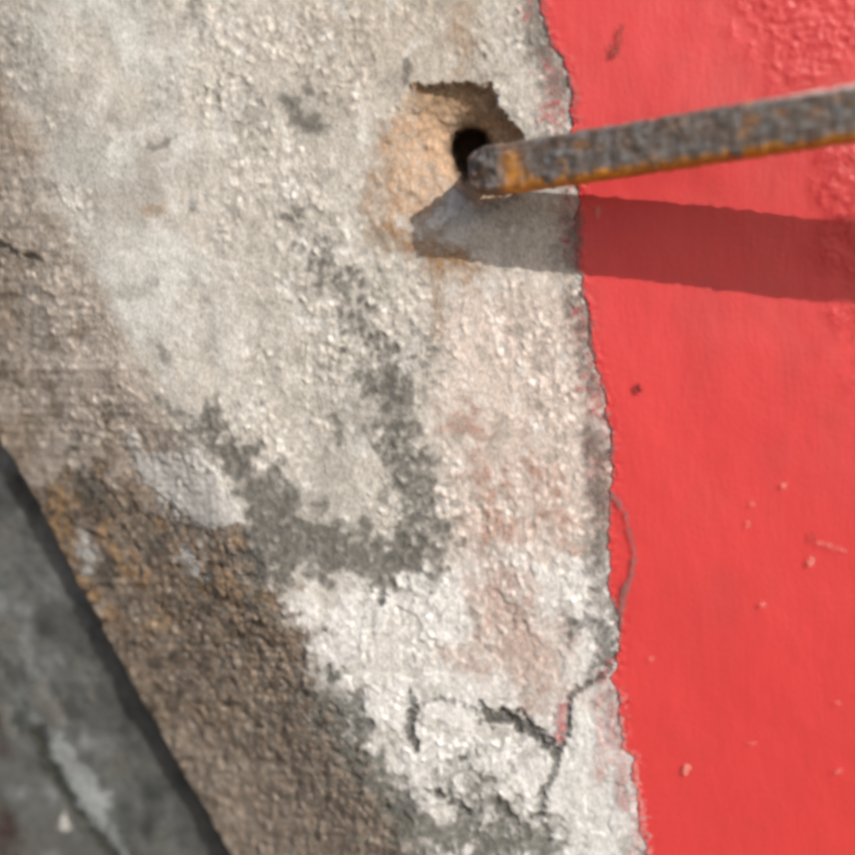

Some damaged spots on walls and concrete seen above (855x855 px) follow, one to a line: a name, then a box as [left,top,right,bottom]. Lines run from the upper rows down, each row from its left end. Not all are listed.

spalling [381,81,522,251]
corrosion [468,84,855,197]
corrosion [393,232,474,279]
damp [126,236,450,604]
peeling [609,490,637,647]
spalling [31,458,410,855]
crack [405,692,418,751]
damp [303,664,564,855]
crack [425,789,470,814]
crack [478,651,616,834]